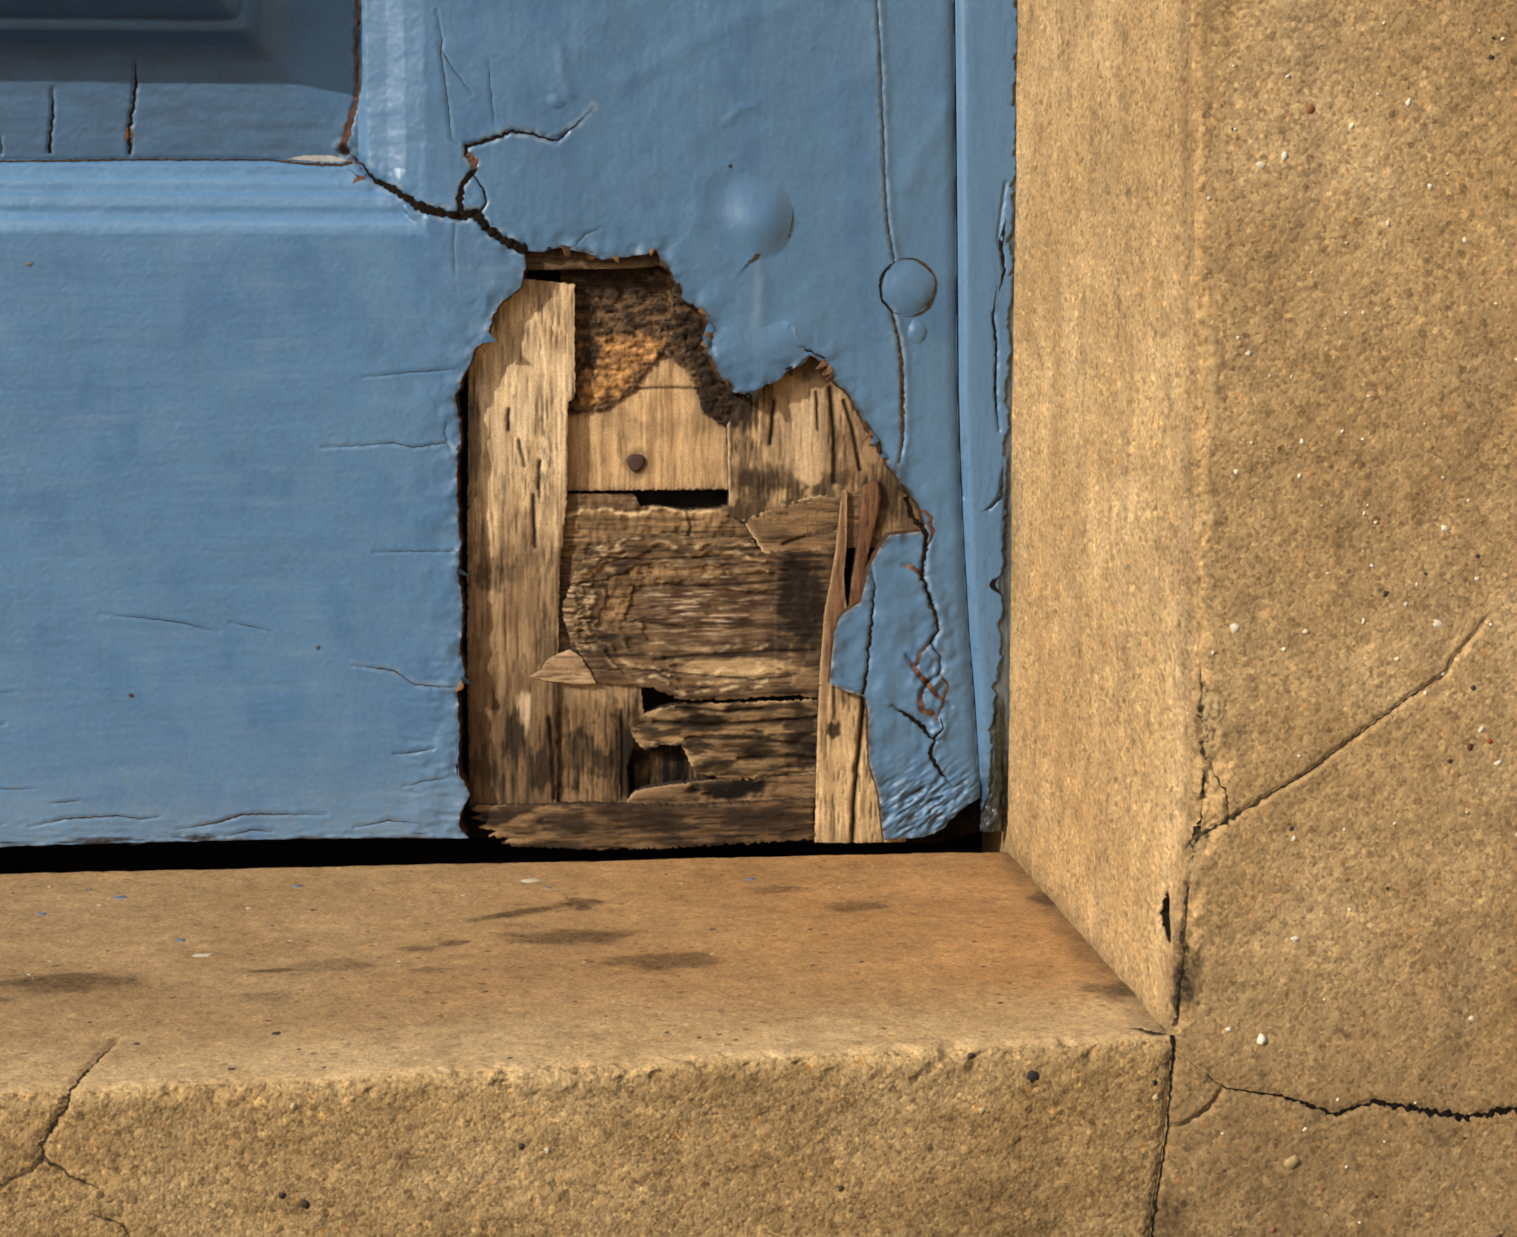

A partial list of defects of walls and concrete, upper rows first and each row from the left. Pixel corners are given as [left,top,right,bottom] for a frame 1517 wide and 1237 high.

crack [0,0,593,275]
peeling [547,245,619,263]
peeling [698,307,714,349]
peeling [816,359,835,382]
peeling [862,421,888,458]
crack [861,311,952,786]
crack [1125,627,1517,1237]
crack [0,1043,129,1237]